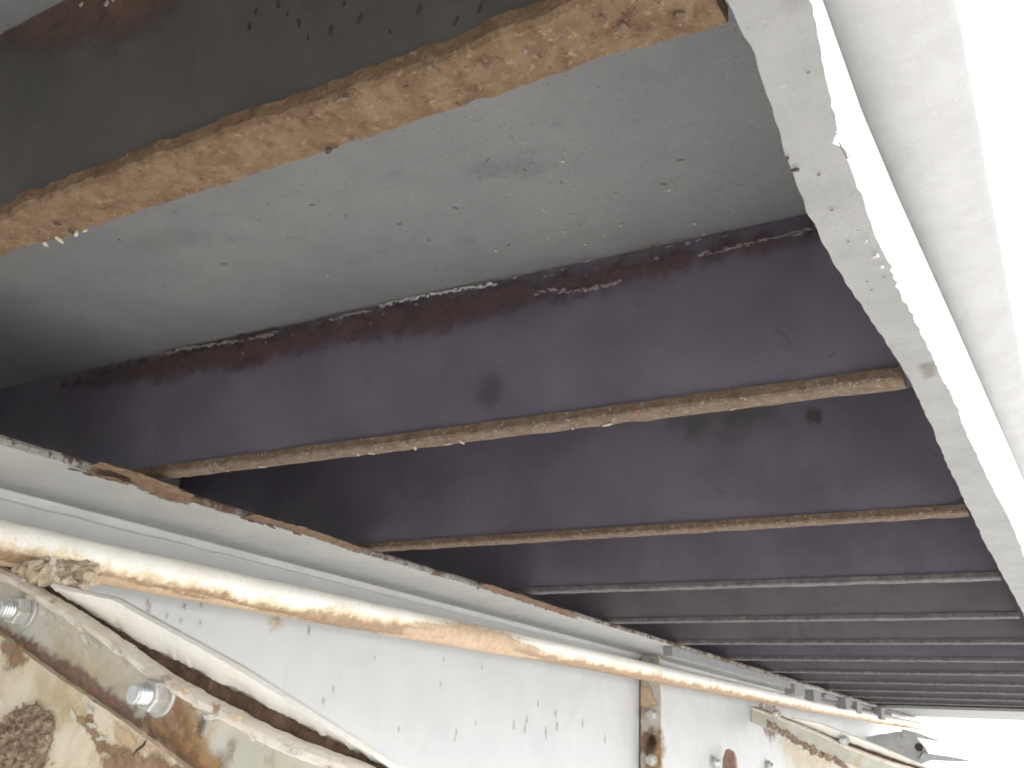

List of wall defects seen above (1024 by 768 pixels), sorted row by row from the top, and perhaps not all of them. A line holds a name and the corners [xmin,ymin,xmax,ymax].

corrosion [2,0,172,51]
corrosion [62,225,819,388]
corrosion [68,462,194,505]
corrosion [241,515,361,553]
corrosion [476,583,580,619]
corrosion [0,556,386,768]
corrosion [353,622,543,659]
corrosion [639,680,665,768]